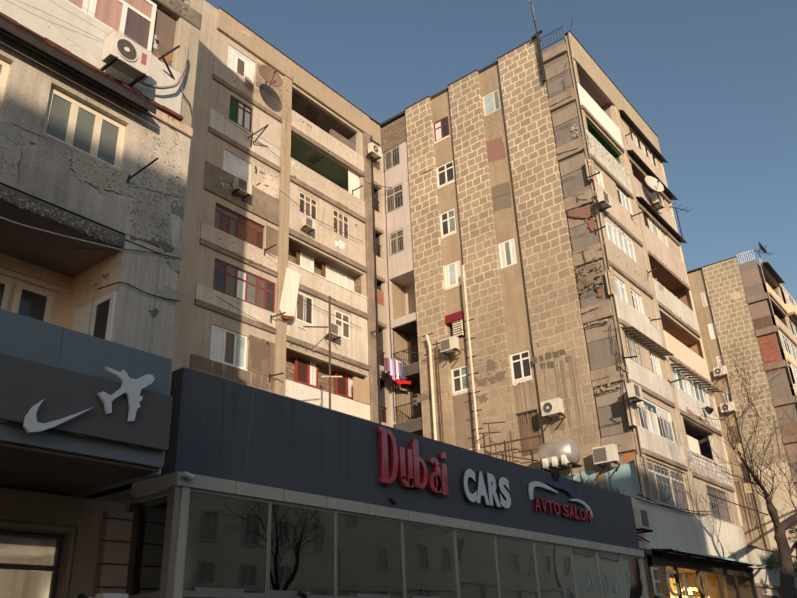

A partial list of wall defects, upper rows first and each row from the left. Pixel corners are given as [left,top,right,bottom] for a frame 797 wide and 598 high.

peeling [0,187,120,246]
spalling [574,252,604,300]